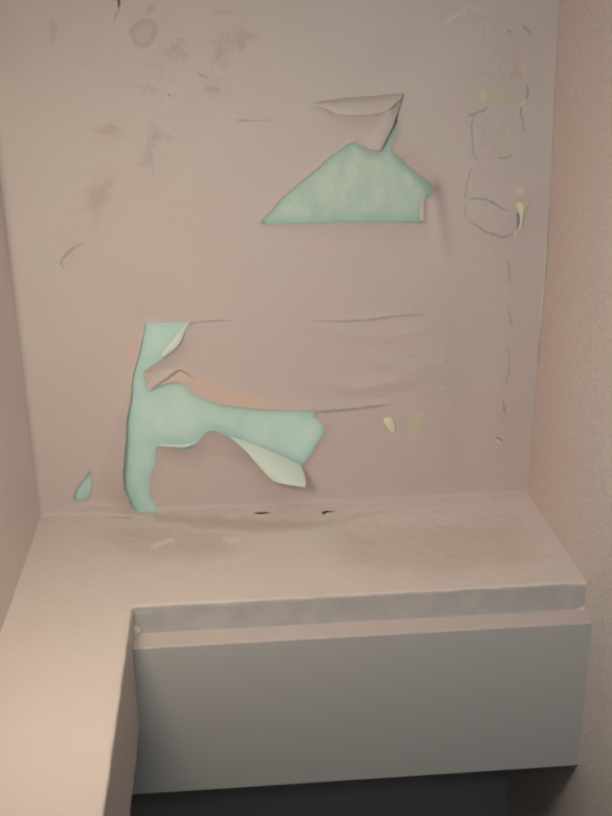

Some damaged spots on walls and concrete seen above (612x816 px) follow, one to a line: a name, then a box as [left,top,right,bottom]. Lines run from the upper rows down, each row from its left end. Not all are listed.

crack [113,0,121,22]
peeling [253,94,447,238]
crack [464,105,513,199]
peeling [96,317,331,519]